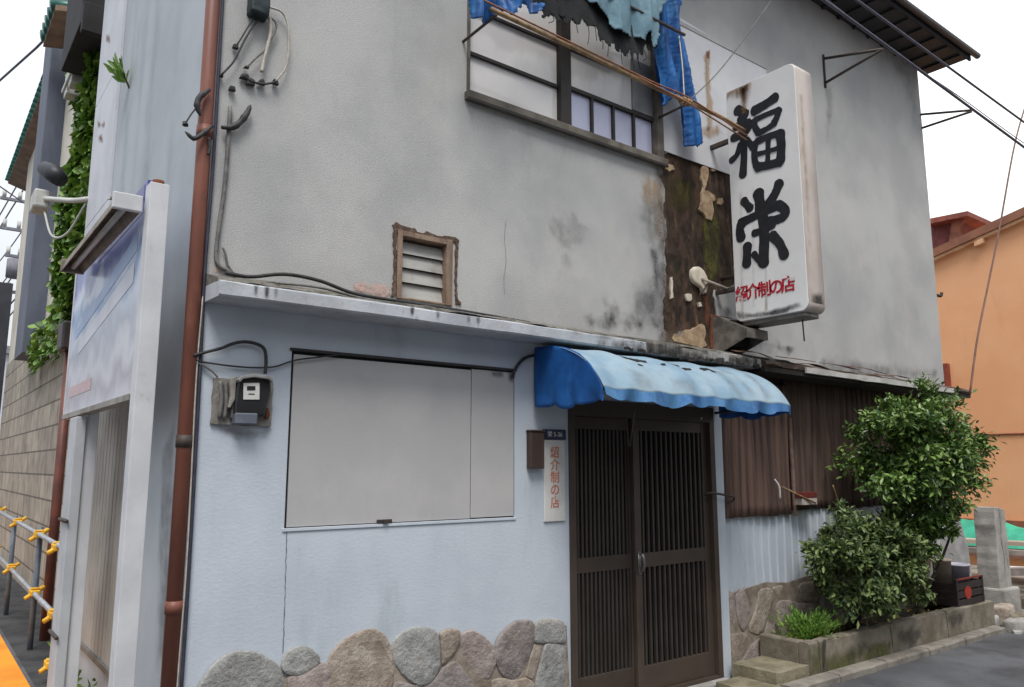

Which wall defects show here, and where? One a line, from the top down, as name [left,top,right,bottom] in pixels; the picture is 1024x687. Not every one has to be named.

rust [705,51,719,137]
spalling [354,222,461,305]
spalling [603,153,763,371]